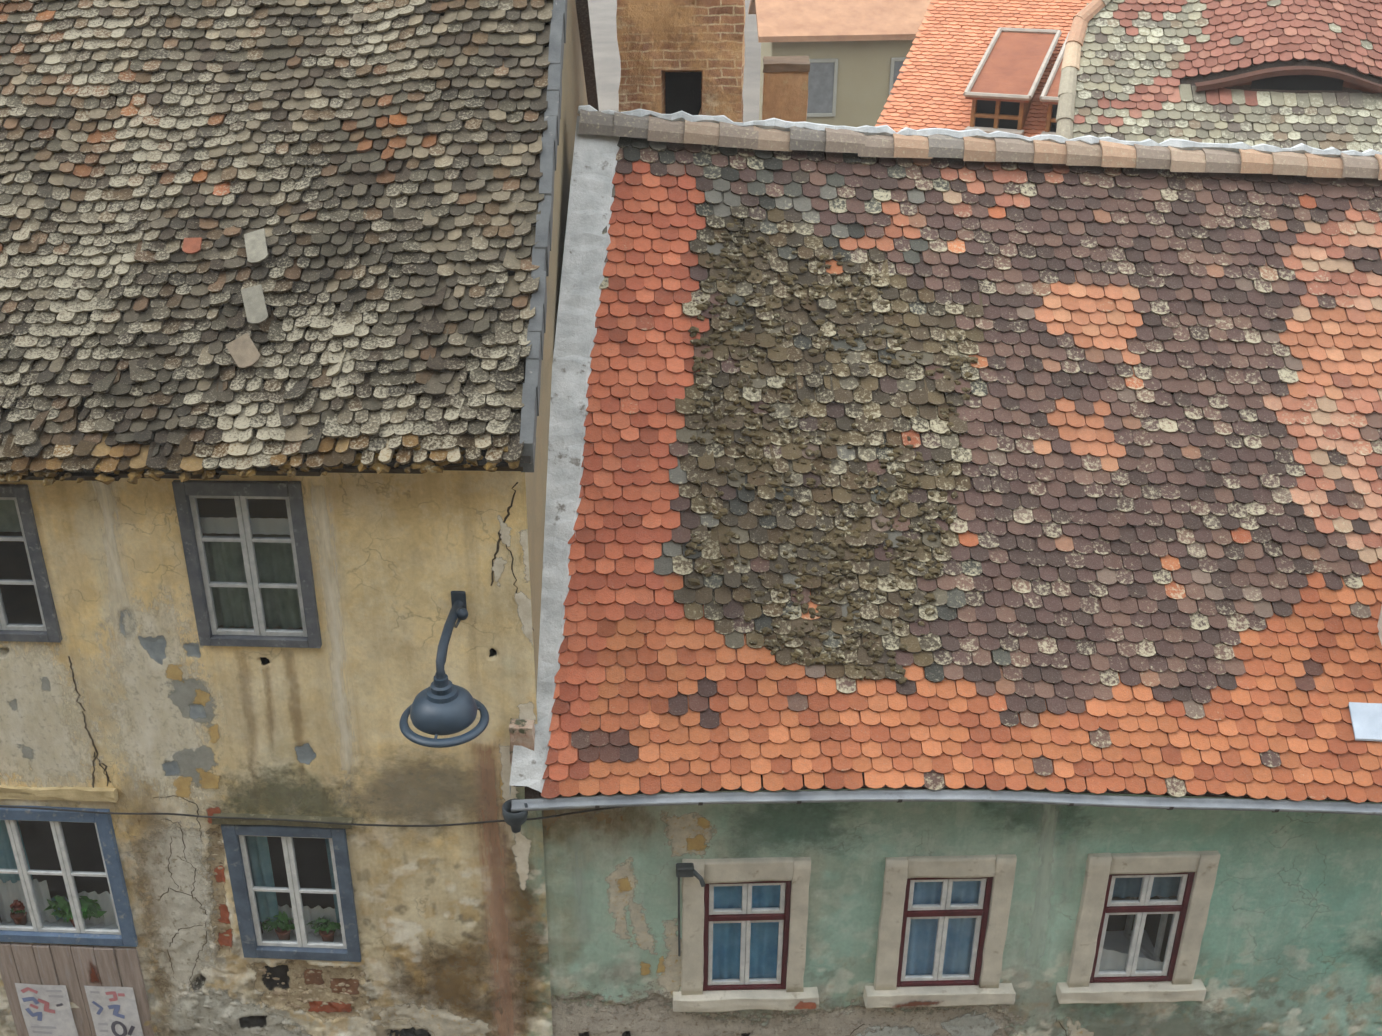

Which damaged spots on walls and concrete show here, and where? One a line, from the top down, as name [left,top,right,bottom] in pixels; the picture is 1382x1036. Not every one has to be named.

crack [68,656,111,788]
peeling [119,610,220,799]
leakage [94,481,478,825]
crack [490,482,534,645]
crack [153,795,207,986]
peeling [127,823,233,1005]
flaking render [239,959,491,1036]
flaking render [551,857,1029,1036]